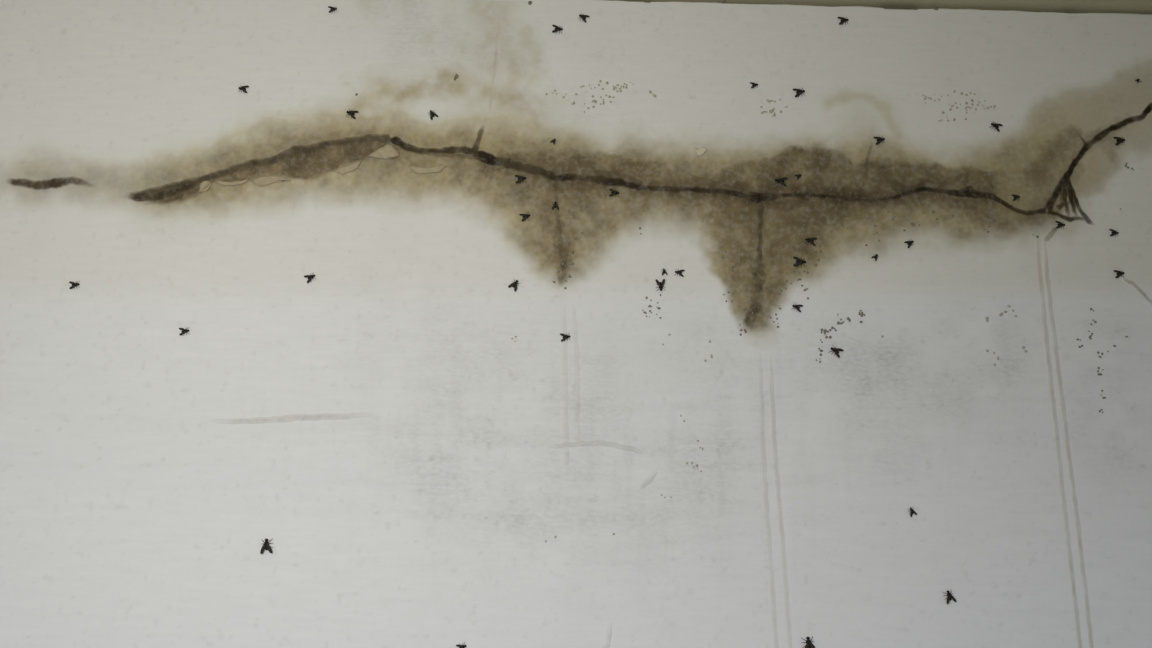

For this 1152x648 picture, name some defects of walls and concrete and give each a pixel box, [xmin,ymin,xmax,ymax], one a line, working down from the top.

flaking render [123,134,399,206]
leakage [0,90,1059,648]
leakage [334,0,1152,210]
crack [389,102,1152,284]
leakage [993,111,1152,648]
crack [1119,275,1152,308]